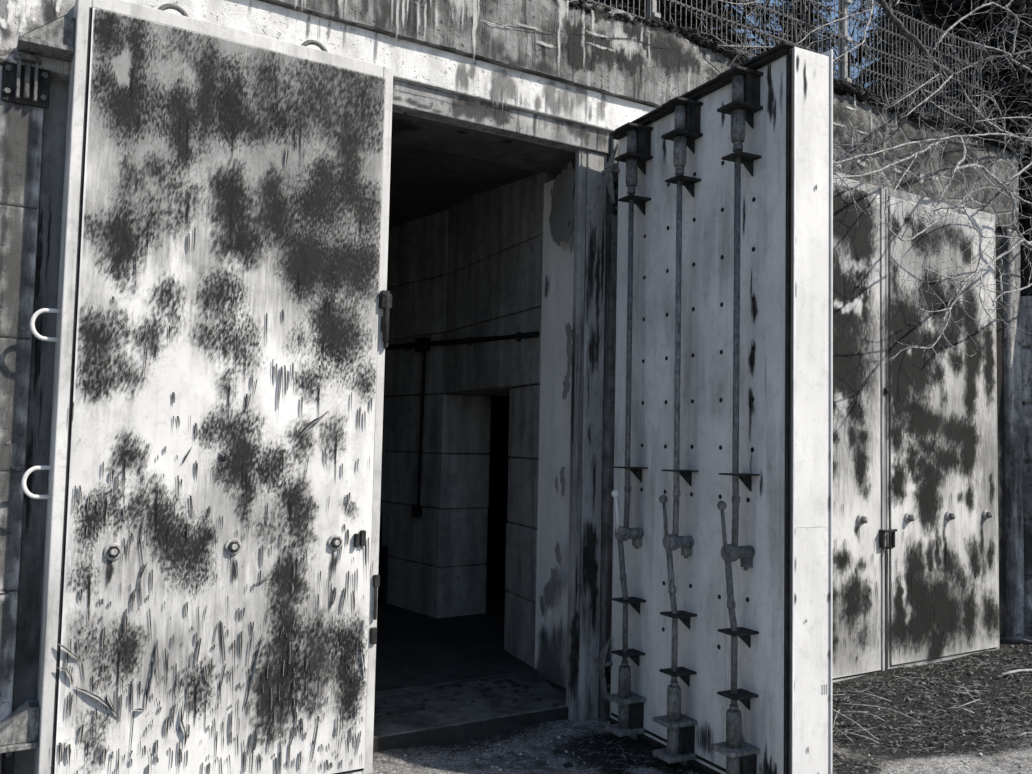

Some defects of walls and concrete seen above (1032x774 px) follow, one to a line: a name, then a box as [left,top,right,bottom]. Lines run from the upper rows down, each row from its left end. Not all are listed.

damp [363,0,438,60]
damp [451,0,701,142]
damp [0,102,39,683]